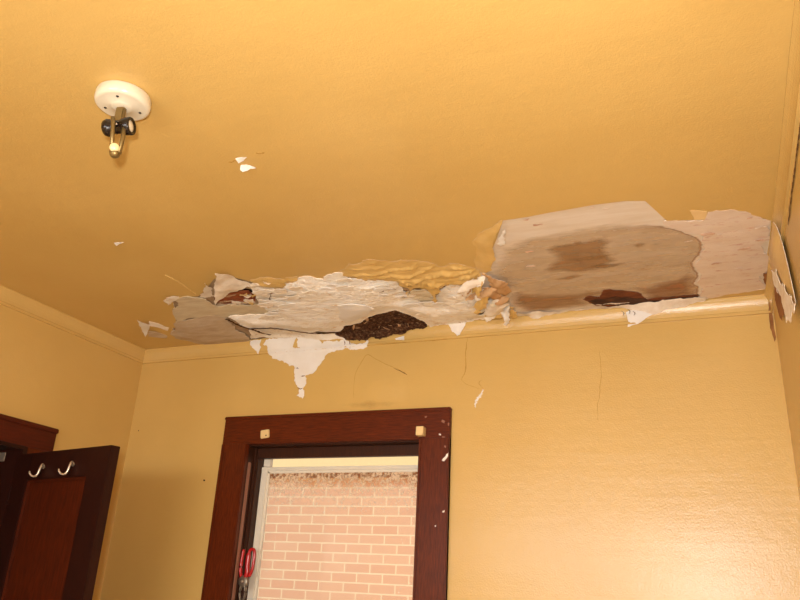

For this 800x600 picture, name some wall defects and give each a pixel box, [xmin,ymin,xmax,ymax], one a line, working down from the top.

peeling [229,157,255,172]
leakage [551,241,614,285]
peeling [477,201,796,327]
spalling [395,286,445,302]
peeling [137,273,369,399]
peeling [449,323,465,336]
crack [461,338,484,407]